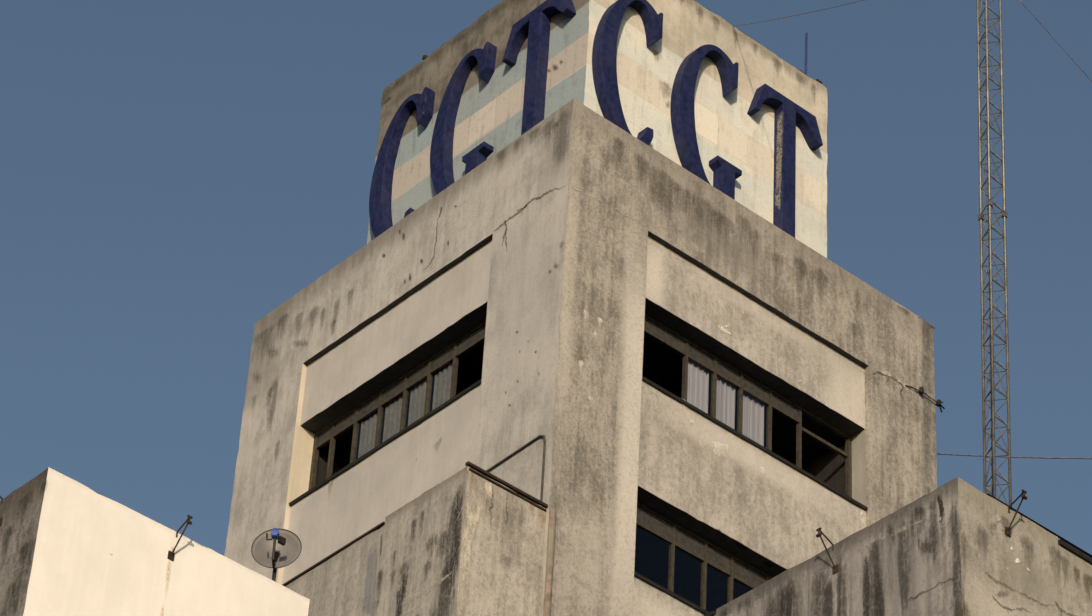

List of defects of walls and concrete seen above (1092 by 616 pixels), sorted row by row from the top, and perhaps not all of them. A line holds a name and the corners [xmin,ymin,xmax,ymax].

crack [497,186,564,251]
leakage [428,482,493,616]
leakage [768,565,846,616]
leakage [863,502,936,616]
leakage [951,510,968,616]